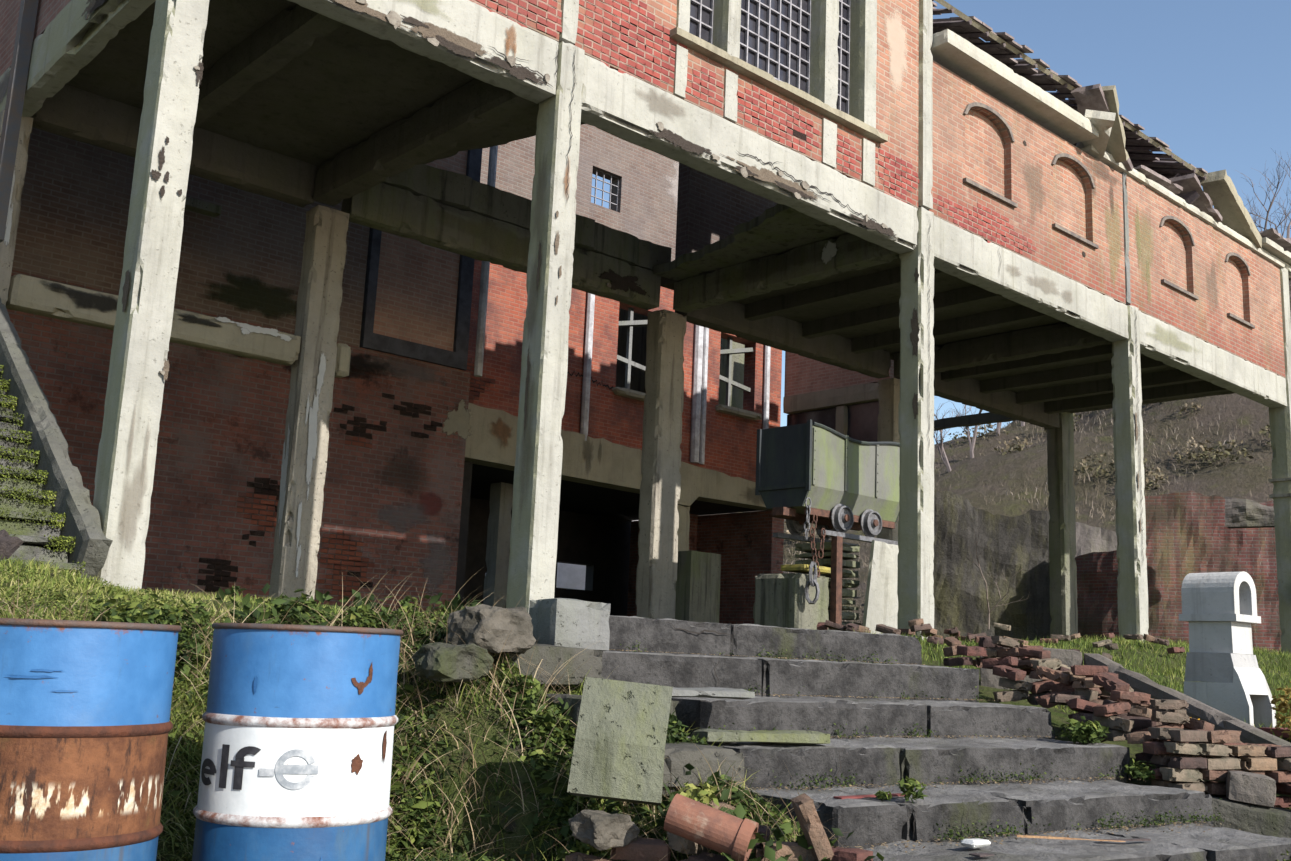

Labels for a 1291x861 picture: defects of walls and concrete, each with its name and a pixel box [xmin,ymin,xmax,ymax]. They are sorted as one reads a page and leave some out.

spalling [335,0,550,84]
spalling [470,0,819,153]
spalling [151,136,182,197]
spalling [649,122,817,201]
spalling [836,134,919,204]
spalling [844,212,898,239]
spalling [933,195,1036,255]
spalling [237,353,495,578]
spalling [318,529,375,601]